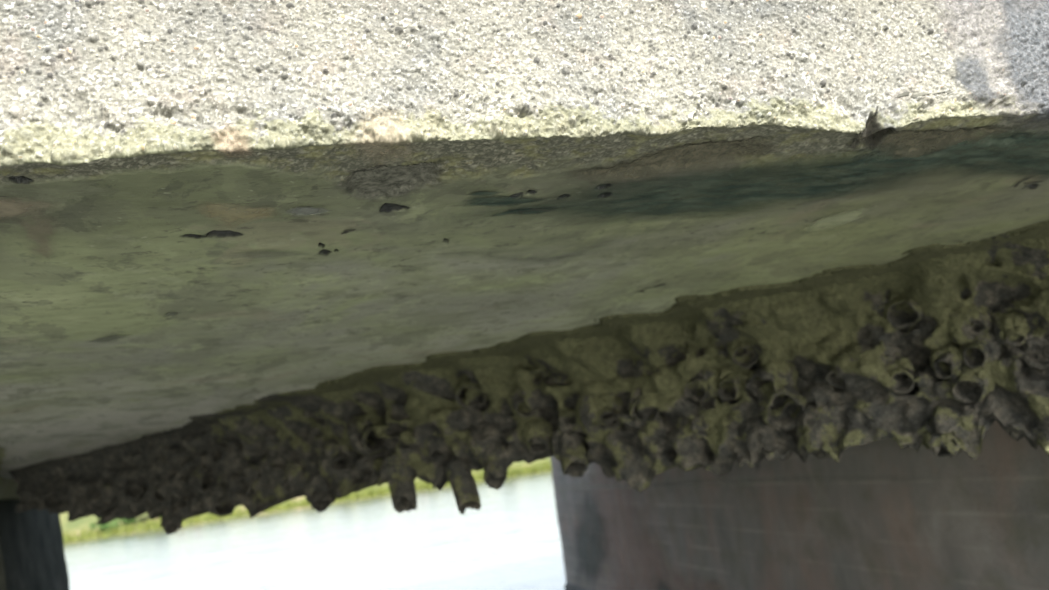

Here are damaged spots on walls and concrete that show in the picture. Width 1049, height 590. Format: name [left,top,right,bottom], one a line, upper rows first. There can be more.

damp [953,0,1049,123]
spalling [850,113,1007,157]
spalling [8,176,33,184]
spalling [342,161,443,213]
spalling [182,230,243,239]